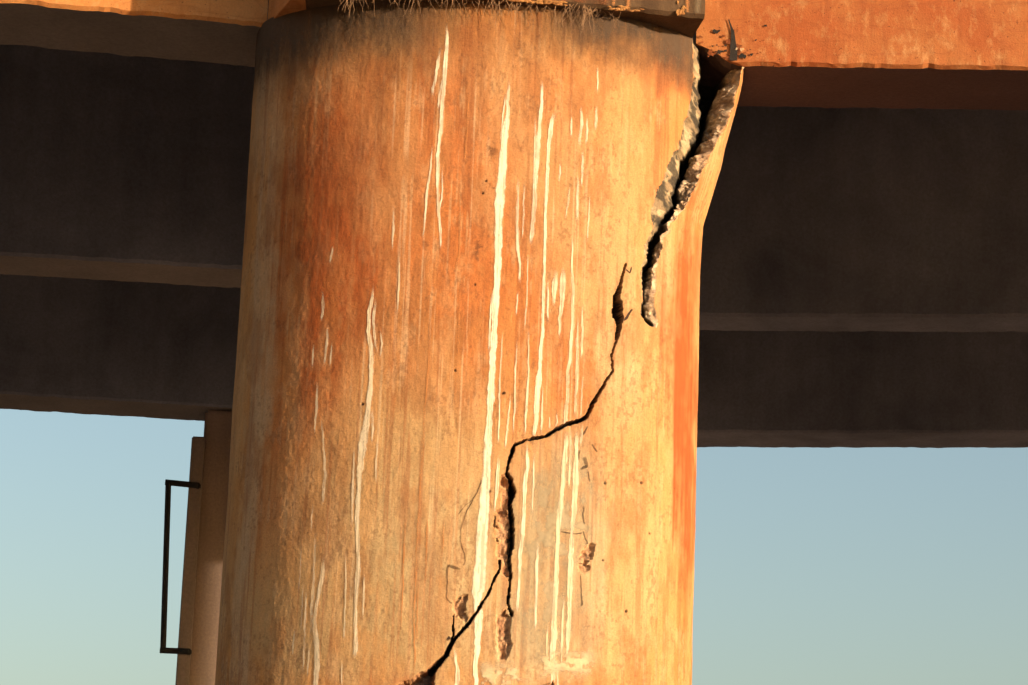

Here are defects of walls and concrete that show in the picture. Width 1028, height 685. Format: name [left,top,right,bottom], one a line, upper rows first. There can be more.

corrosion [603,0,644,12]
crack [728,19,738,61]
efflorescence [424,31,449,245]
efflorescence [343,294,383,654]
spalling [492,473,509,578]
water stain [472,88,589,685]
crack [427,44,711,677]
corrosion [674,307,696,536]
efflorescence [292,547,325,685]
spalling [399,660,439,685]
spalling [481,607,520,685]
flaking render [542,651,591,685]